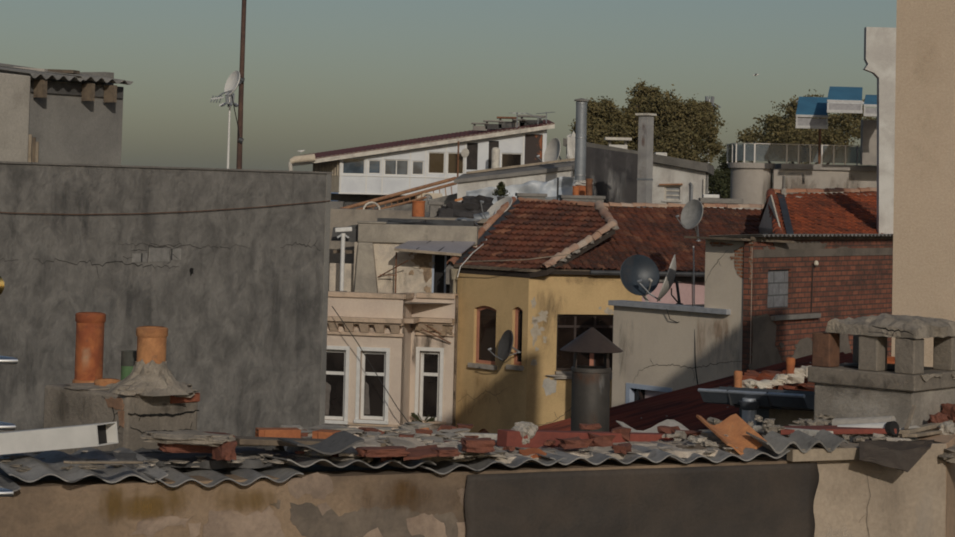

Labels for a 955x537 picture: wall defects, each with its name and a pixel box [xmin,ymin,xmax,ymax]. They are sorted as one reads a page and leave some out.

crack [38,239,245,278]
spalling [710,241,769,280]
crack [102,396,199,434]
flaking render [130,472,466,537]